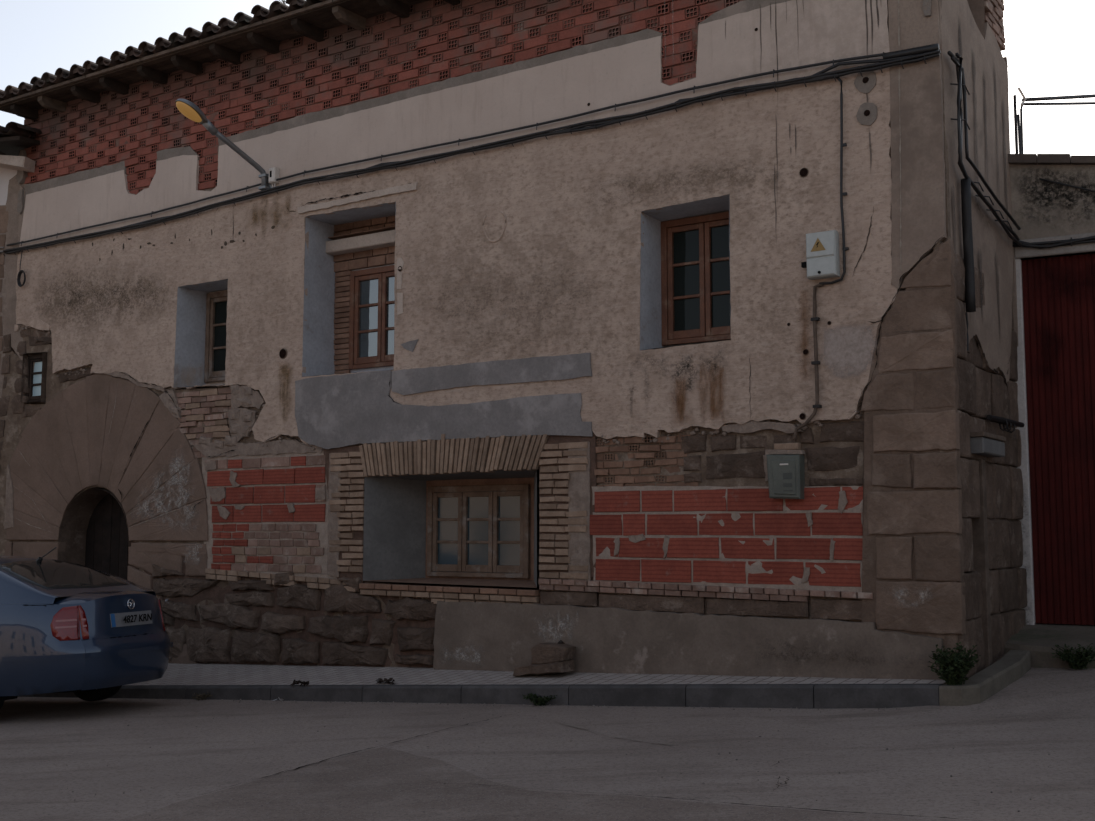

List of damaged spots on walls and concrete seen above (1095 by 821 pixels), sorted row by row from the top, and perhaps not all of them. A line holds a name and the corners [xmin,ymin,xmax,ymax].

water stain [760,5,778,81]
water stain [865,0,879,49]
spalling [594,396,864,487]